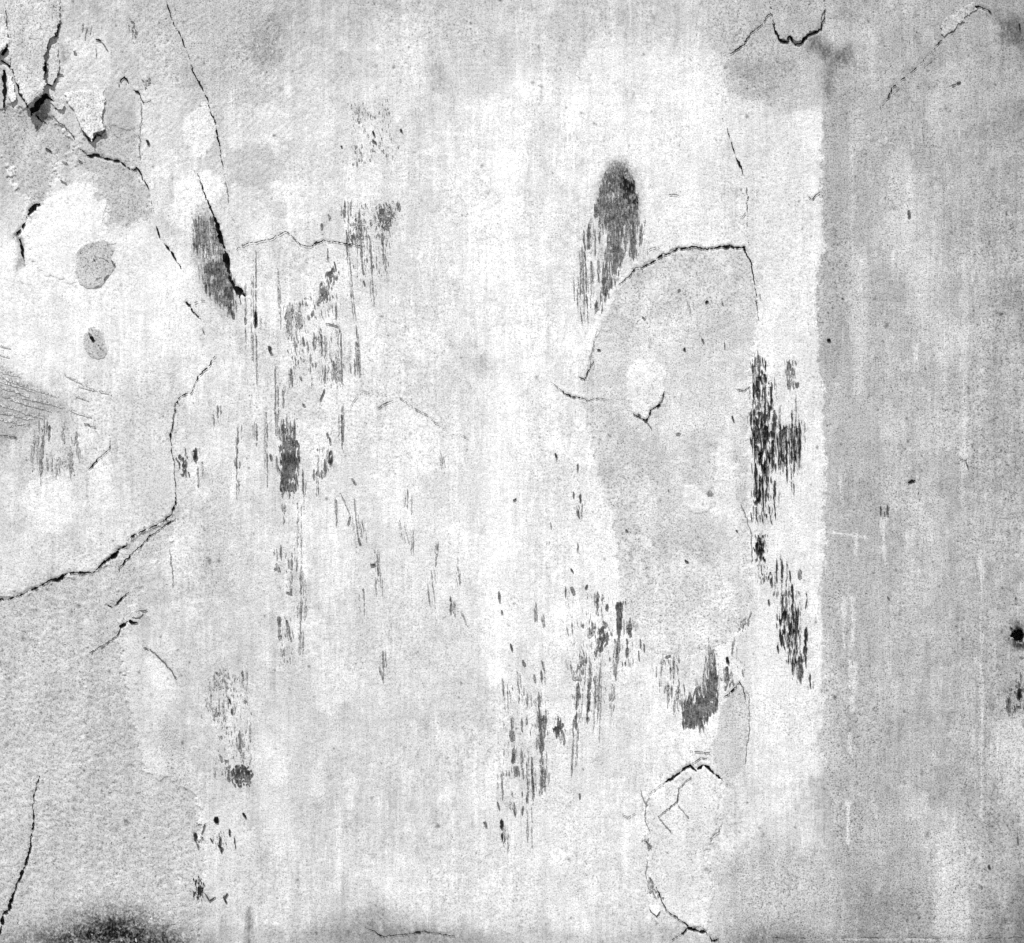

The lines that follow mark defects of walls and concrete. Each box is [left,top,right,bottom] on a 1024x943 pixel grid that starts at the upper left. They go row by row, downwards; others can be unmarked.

spalling [0,0,154,228]
crack [166,1,361,302]
water stain [573,169,642,313]
crack [619,242,759,318]
crack [0,300,215,678]
water stain [234,201,392,663]
water stain [748,351,806,518]
crack [0,776,40,933]
water stain [499,660,547,852]
water stain [562,591,632,775]
crack [622,751,722,832]
water stain [755,533,814,688]